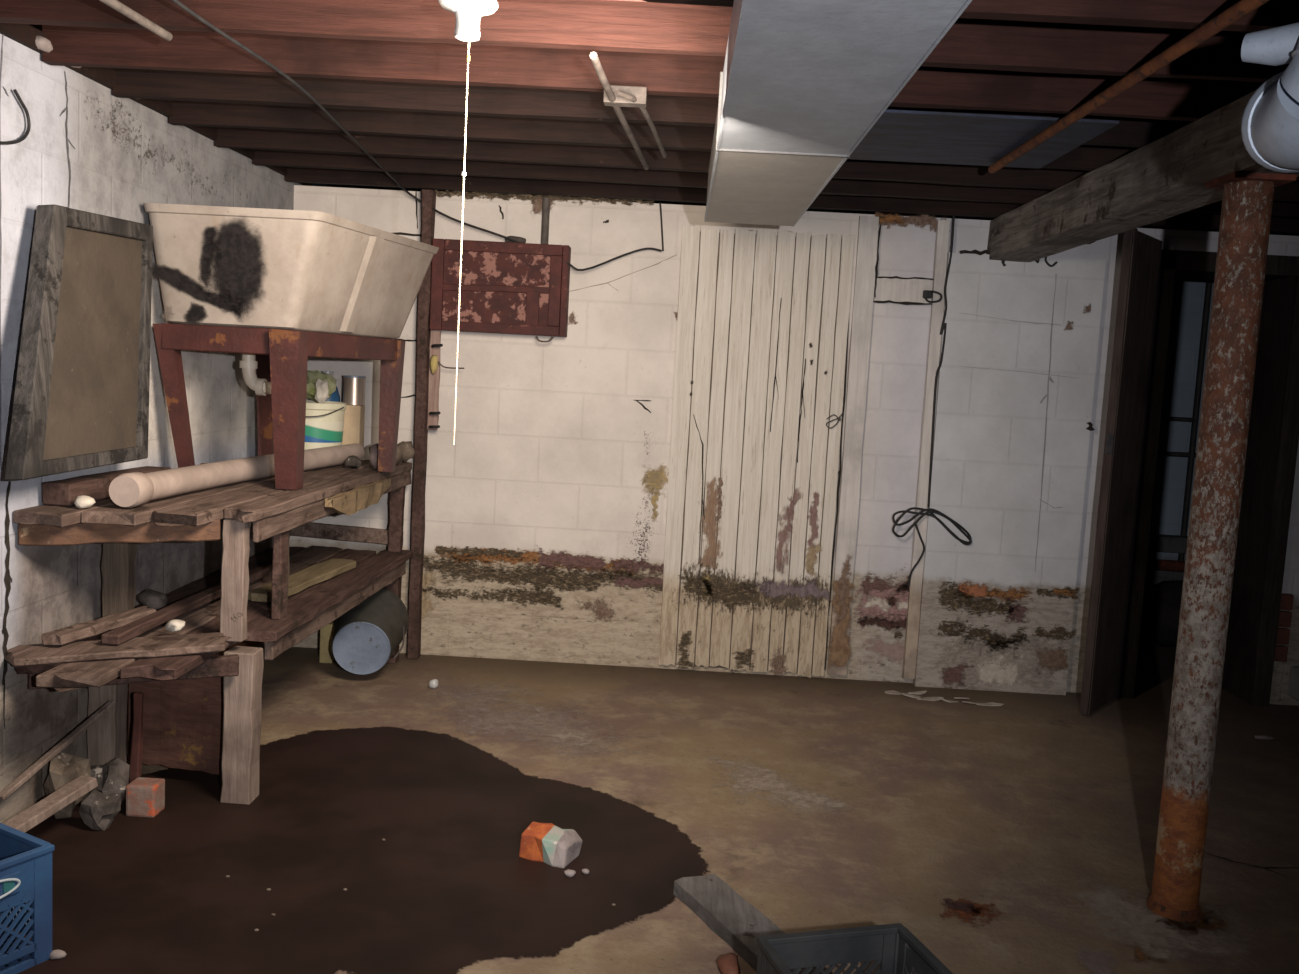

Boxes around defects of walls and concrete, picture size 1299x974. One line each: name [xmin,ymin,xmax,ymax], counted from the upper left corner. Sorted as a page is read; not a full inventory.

leakage [643,466,669,521]
leakage [422,478,909,670]
leakage [938,577,1080,652]
leakage [731,649,754,674]
leakage [770,650,786,677]
leakage [15,682,711,974]
corrosion [940,898,1003,928]